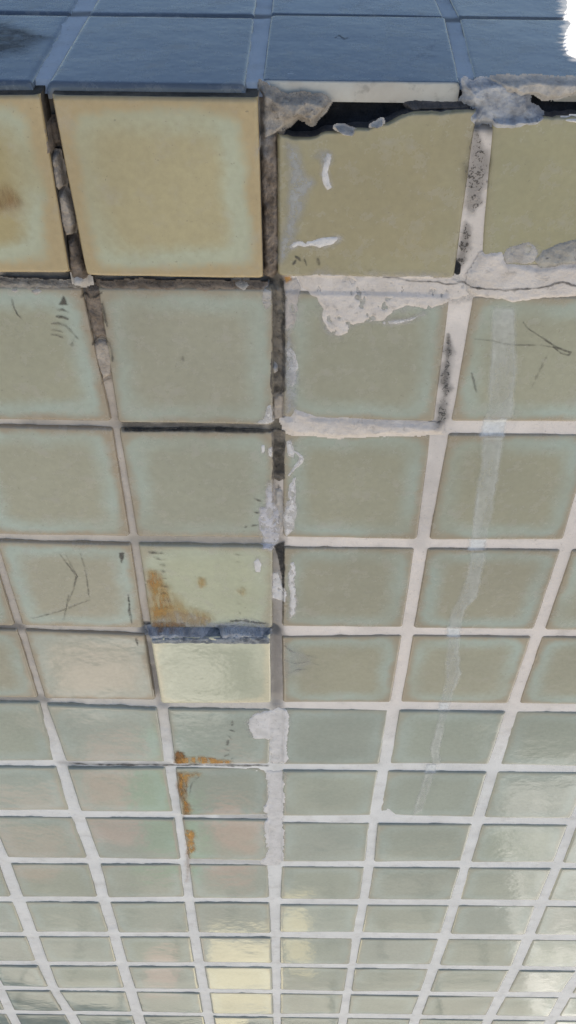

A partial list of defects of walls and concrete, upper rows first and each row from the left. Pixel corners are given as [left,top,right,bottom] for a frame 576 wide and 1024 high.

spalling [288,90,470,136]
spalling [530,95,576,122]
crack [81,292,113,362]
rust [175,752,229,815]